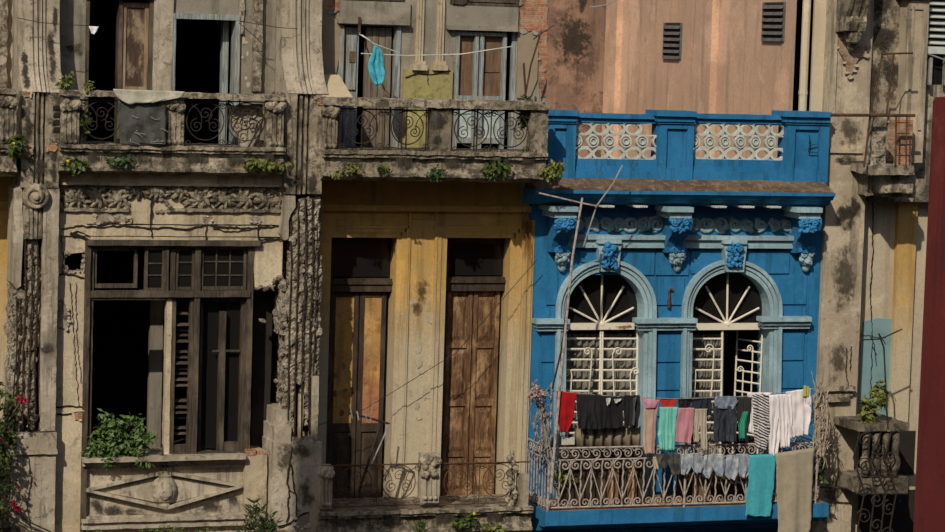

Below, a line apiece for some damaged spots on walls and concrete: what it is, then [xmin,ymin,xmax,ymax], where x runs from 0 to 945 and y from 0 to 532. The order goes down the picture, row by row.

spalling [322,0,340,15]
spalling [519,0,548,102]
spalling [61,250,85,274]
spalling [254,195,323,438]
leakage [413,280,427,315]
leakage [832,245,855,308]
leakage [830,345,847,381]
crack [278,447,309,532]